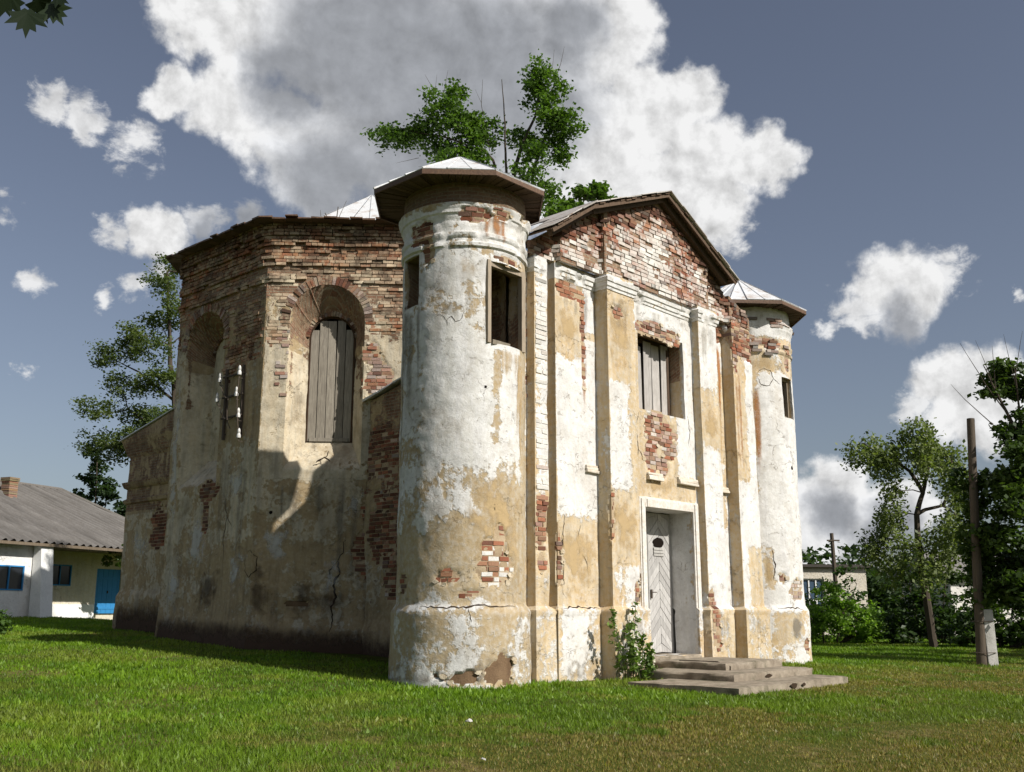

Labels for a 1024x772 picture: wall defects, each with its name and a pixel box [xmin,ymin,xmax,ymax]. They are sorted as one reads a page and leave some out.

spalling [458,206,514,223]
spalling [642,410,678,490]
spalling [149,502,167,551]
spalling [197,479,222,534]
spalling [351,419,408,600]
spalling [432,478,519,598]
peeling [534,494,593,586]
damp [115,608,390,658]
crack [328,540,346,632]
crack [425,604,508,621]
spalling [434,652,517,687]